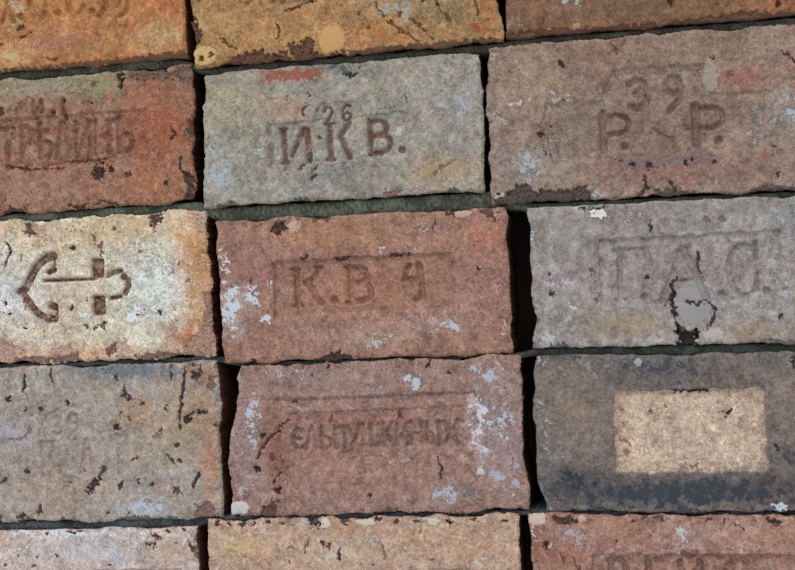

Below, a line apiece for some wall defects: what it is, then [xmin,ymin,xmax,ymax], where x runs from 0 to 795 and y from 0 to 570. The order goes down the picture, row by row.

damp [218,248,290,339]
spalling [673,325,699,345]
damp [458,360,521,500]
damp [428,484,489,504]